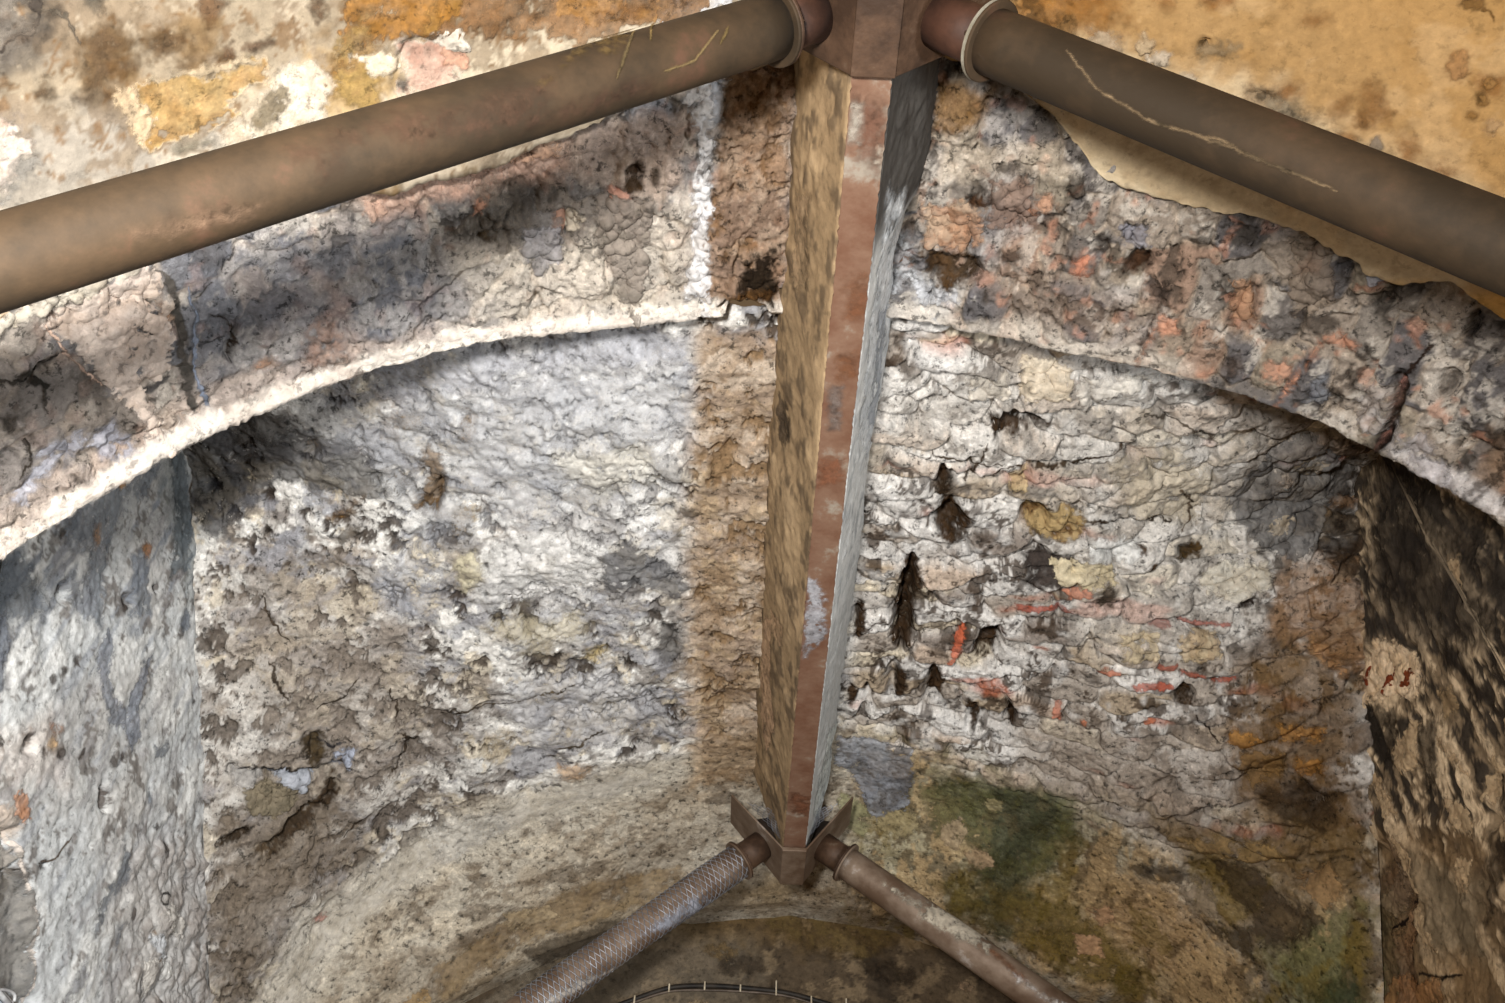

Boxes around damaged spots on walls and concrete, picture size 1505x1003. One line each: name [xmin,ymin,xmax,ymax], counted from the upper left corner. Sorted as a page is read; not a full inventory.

corrosion [665,26,729,71]
flaking render [0,266,177,459]
spalling [968,281,1182,436]
spalling [1008,236,1401,614]
crack [1373,343,1434,453]
spalling [935,463,974,544]
spalling [889,551,922,647]
leakage [1307,421,1505,716]
leakage [1367,704,1398,764]
leakage [1417,720,1438,794]
leakage [920,773,1093,944]
leakage [1483,833,1505,924]